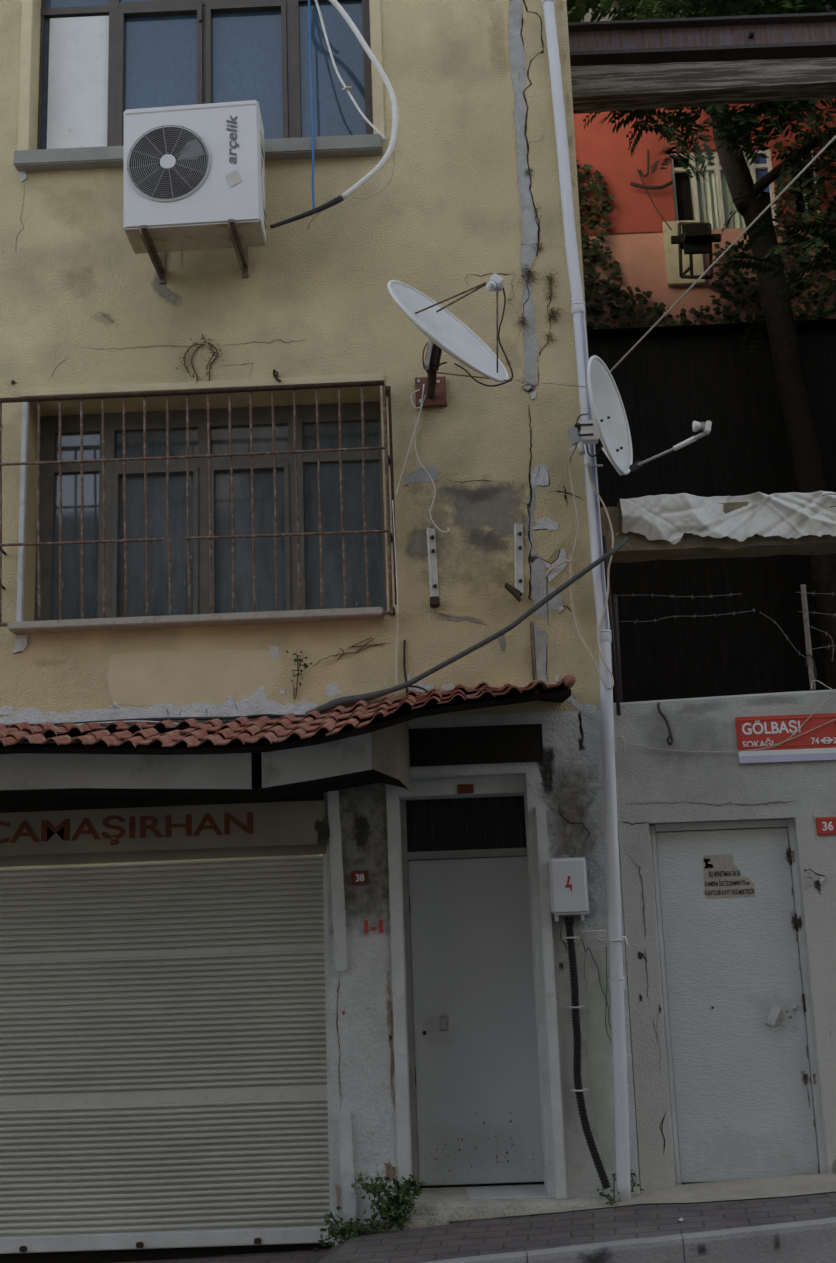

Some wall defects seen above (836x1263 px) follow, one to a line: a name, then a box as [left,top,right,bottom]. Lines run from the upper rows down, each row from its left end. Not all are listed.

crack [467,0,582,515]
damp [408,479,523,559]
flaking render [527,481,572,684]
peeling [0,683,341,730]